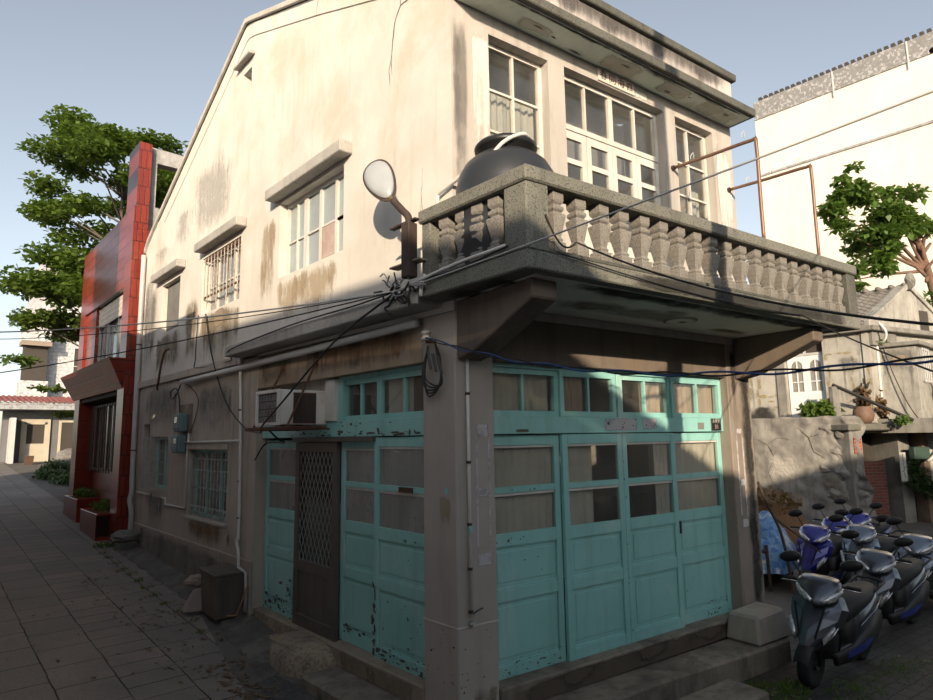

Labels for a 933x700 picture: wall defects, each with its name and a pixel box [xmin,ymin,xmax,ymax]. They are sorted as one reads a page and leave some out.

crack [389,0,407,80]
water stain [145,280,238,364]
water stain [261,223,275,282]
water stain [279,264,334,309]
crack [754,428,822,484]
peeling [343,582,439,679]